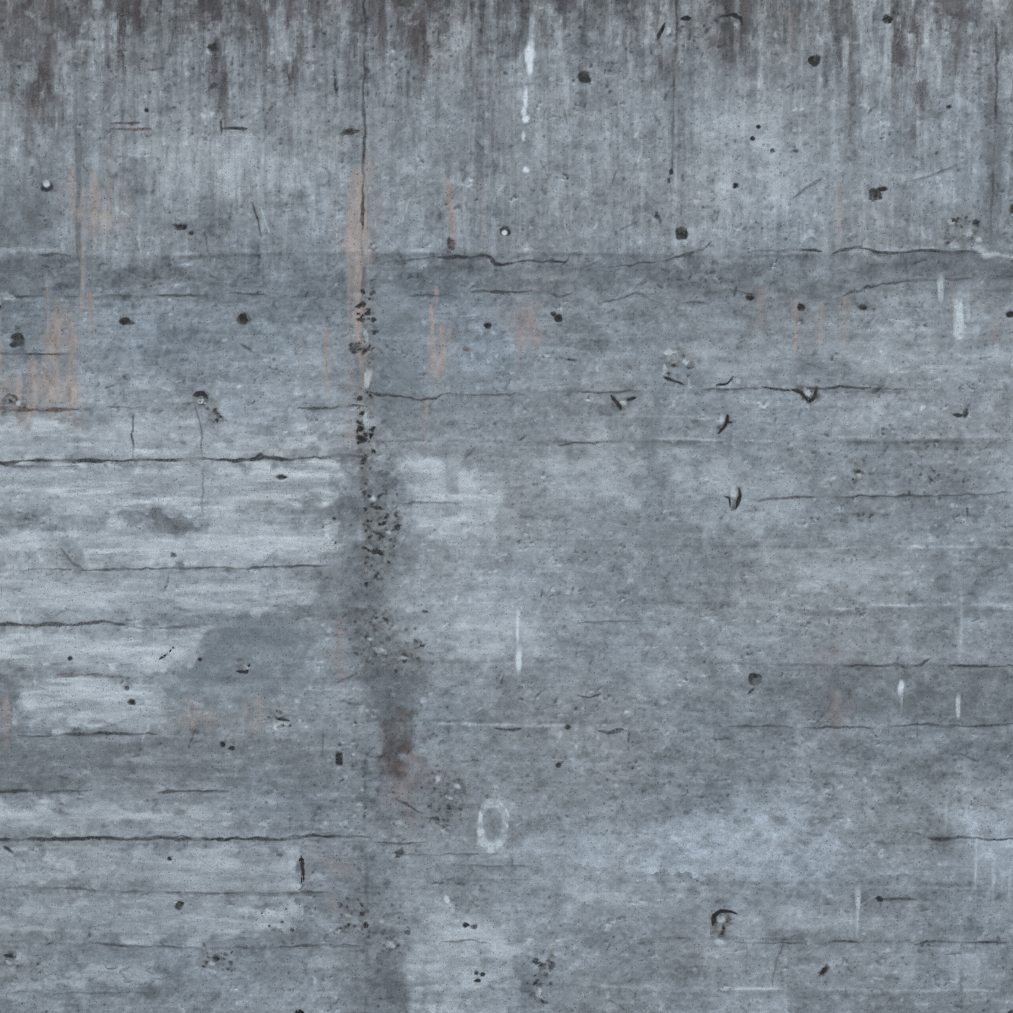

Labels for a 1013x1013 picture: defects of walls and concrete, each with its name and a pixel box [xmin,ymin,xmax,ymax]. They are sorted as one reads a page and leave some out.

water stain [0,0,1013,364]
crack [746,19,1013,298]
corrosion [0,274,98,437]
corrosion [322,152,395,488]
water stain [371,277,428,447]
crack [0,391,369,518]
water stain [333,480,450,732]
crack [0,796,534,869]
corrosion [360,701,440,836]
water stain [344,944,408,1013]
crack [440,937,492,945]